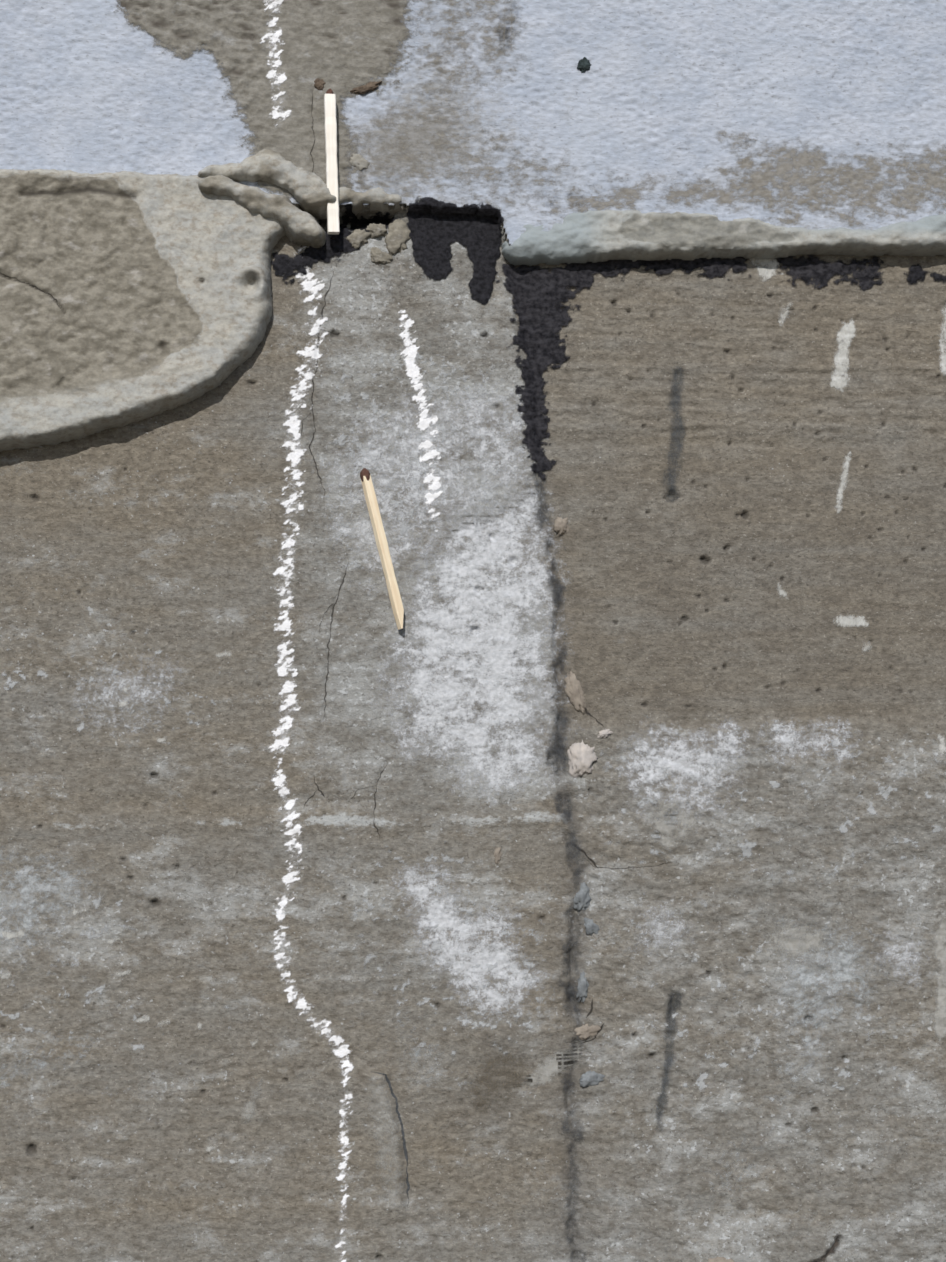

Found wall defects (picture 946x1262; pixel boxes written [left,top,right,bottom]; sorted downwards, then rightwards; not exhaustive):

peeling [117,0,418,189]
peeling [257,181,298,205]
damp [668,368,684,501]
damp [322,380,569,803]
damp [616,722,861,825]
damp [392,863,545,1020]
damp [637,907,693,961]
damp [658,992,680,1119]
damp [784,929,877,1094]
damp [874,931,921,986]